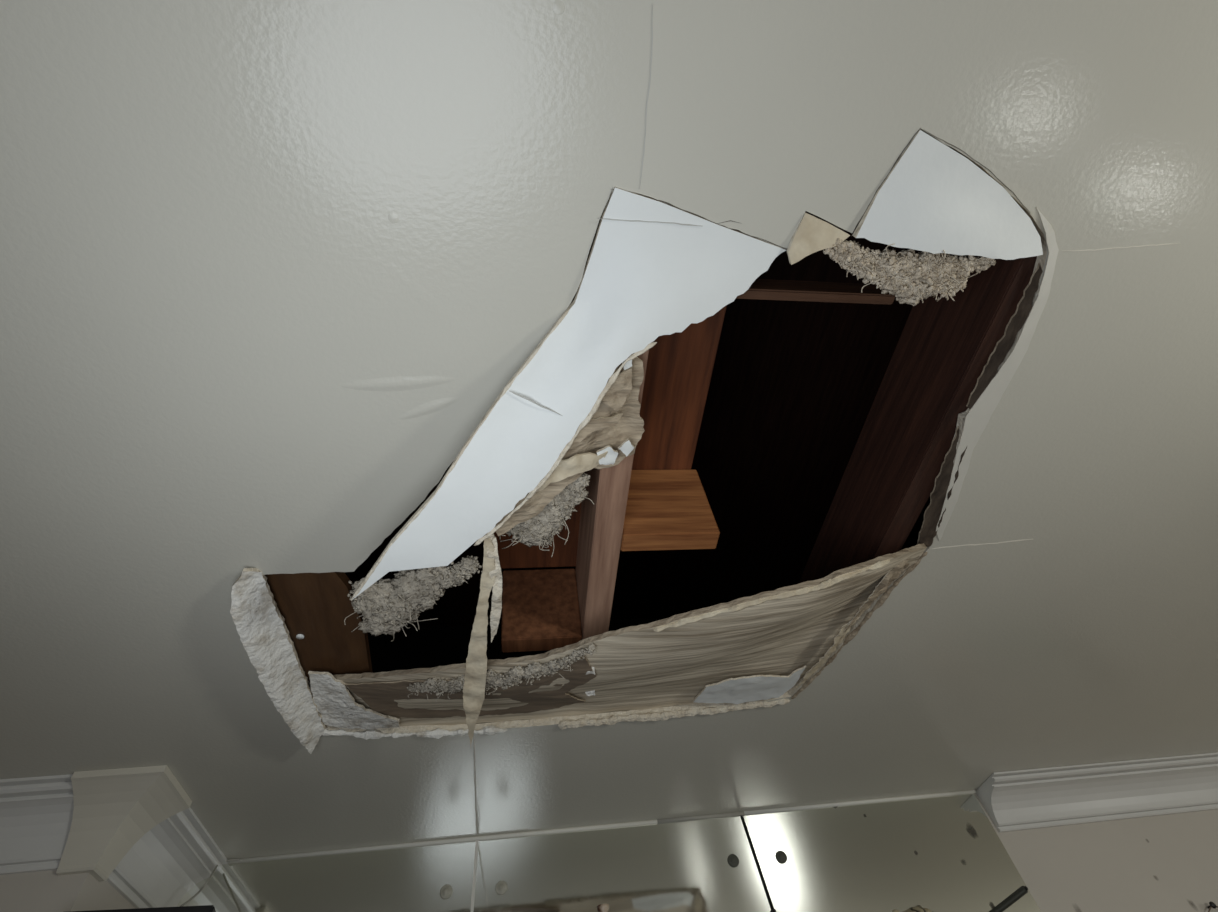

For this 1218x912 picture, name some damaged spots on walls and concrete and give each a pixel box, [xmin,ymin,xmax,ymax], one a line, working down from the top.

crack [597,8,784,248]
peeling [936,207,1059,541]
flaking render [308,671,400,729]
flaking render [693,665,806,704]